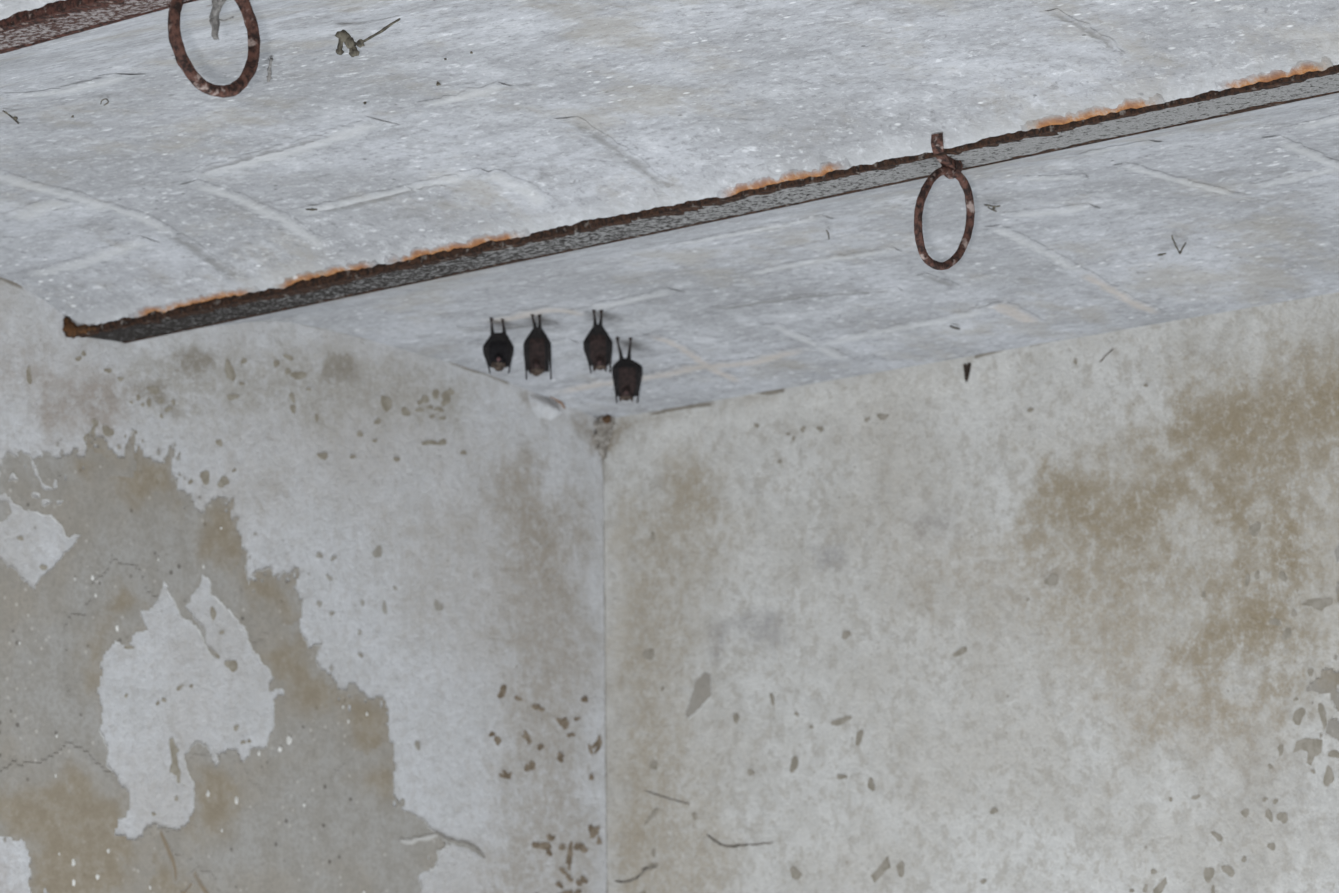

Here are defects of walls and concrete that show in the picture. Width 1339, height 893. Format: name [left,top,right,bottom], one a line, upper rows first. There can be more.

corrosion [1215,56,1333,91]
corrosion [1020,93,1165,131]
corrosion [716,158,851,198]
corrosion [128,228,530,318]
spalling [225,358,247,401]
spalling [273,354,312,413]
spalling [357,388,455,443]
damp [0,294,1339,893]
spalling [1269,583,1339,640]
peeling [0,419,452,893]
spalling [1268,655,1339,786]